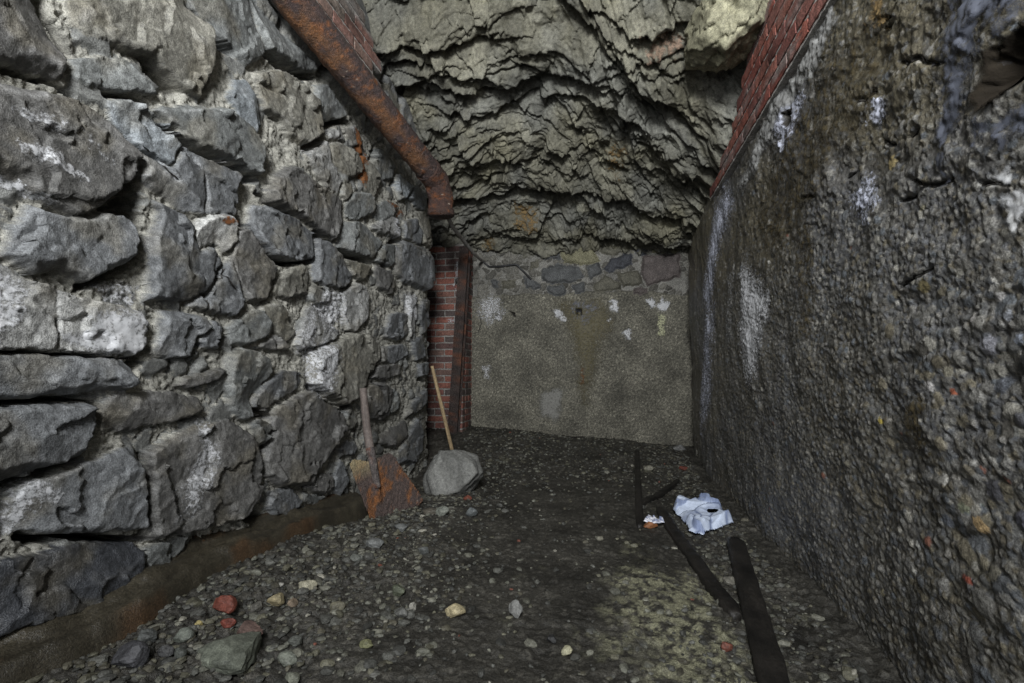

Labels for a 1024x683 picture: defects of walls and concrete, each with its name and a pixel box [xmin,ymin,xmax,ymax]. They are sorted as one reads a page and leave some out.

corrosion [355,127,368,187]
water stain [699,0,899,435]
water stain [554,298,632,407]
water stain [646,297,670,336]